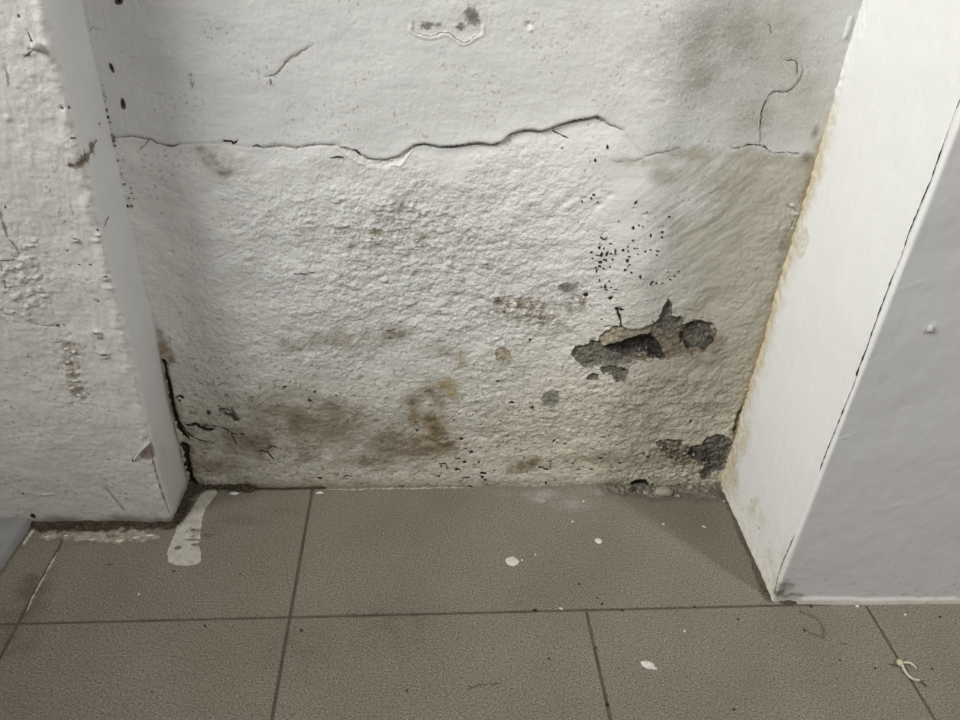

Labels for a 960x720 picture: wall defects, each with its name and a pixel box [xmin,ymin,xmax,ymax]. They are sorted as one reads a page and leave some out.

peeling [408,7,486,47]
crack [265,44,313,84]
crack [732,59,803,154]
crack [65,122,178,169]
crack [223,130,525,160]
crack [616,147,679,162]
leakage [590,114,829,485]
flaking render [571,299,718,382]
crack [162,359,241,483]
flaking render [656,433,733,485]